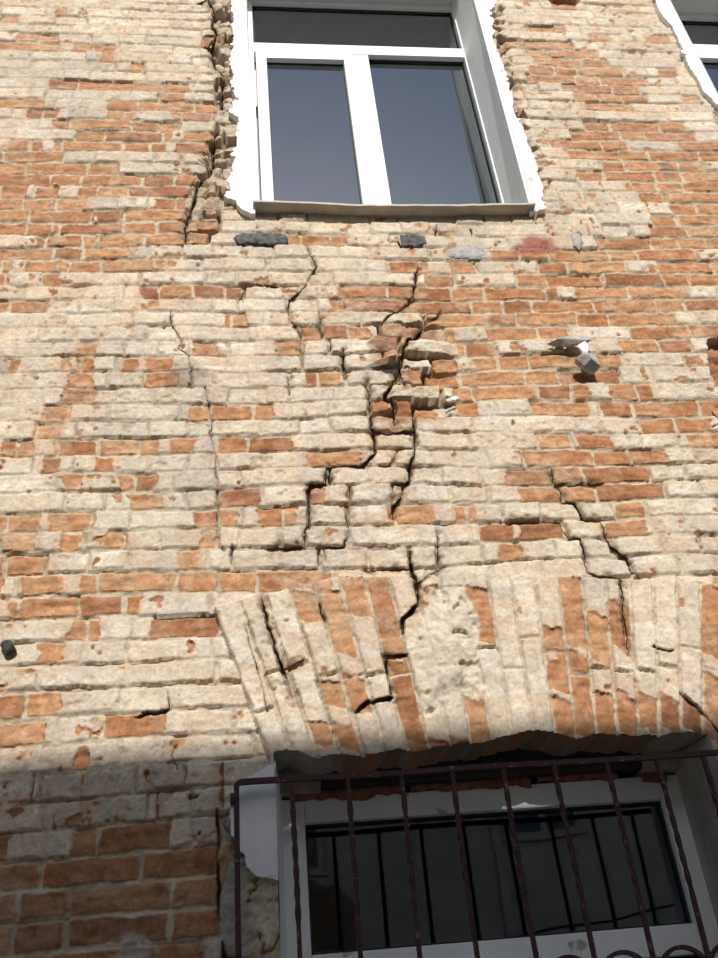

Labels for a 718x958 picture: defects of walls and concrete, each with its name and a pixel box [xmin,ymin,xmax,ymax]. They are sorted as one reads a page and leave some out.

crack [198,0,223,111]
crack [184,134,219,242]
flaking render [329,24,718,352]
flaking render [189,404,275,421]
flaking render [219,437,294,453]
crack [238,248,441,562]
flaking render [406,336,718,447]
flaking render [504,434,670,538]
crack [510,468,640,654]
crack [246,596,304,711]
crack [356,531,439,712]
peeling [294,772,618,803]